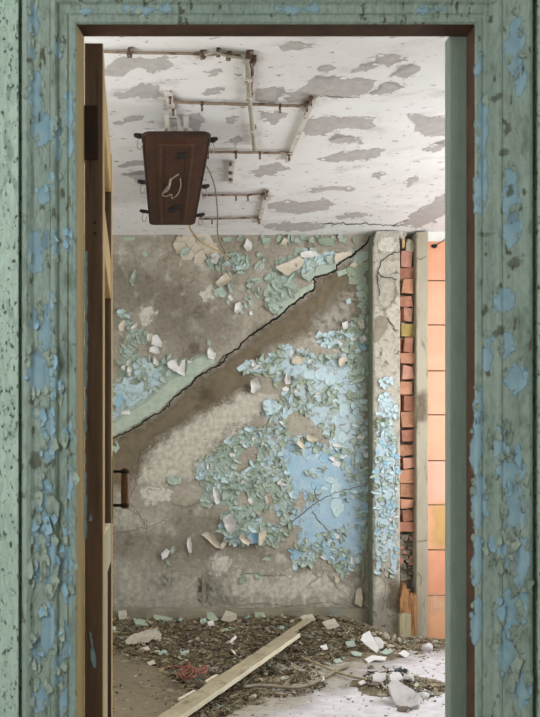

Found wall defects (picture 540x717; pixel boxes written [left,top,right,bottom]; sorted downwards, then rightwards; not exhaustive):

peeling [105,55,174,77]
peeling [114,82,165,100]
peeling [255,53,421,125]
peeling [303,115,386,163]
peeling [398,193,445,229]
peeling [408,113,445,153]
peeling [473,95,489,215]
peeling [113,309,216,453]
crack [113,219,408,438]
peeling [173,185,402,584]
peeling [23,291,80,717]
peeling [469,379,535,717]